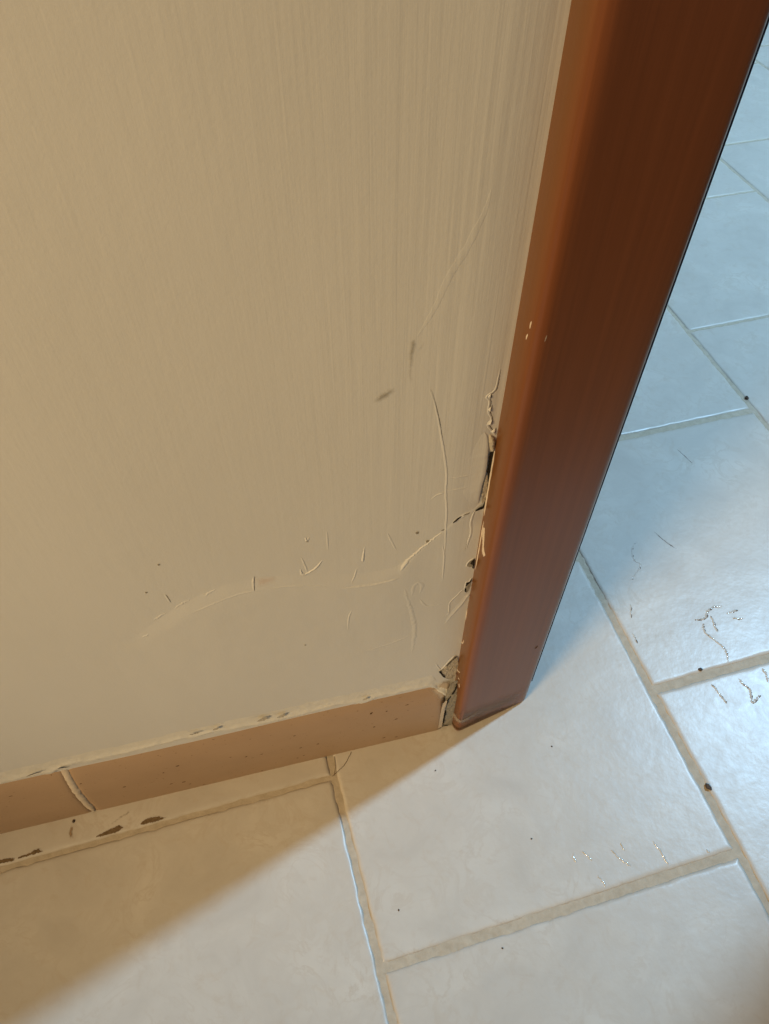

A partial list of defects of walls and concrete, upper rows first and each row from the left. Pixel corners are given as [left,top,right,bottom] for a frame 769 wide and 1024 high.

crack [400,390,475,571]
spalling [444,528,485,625]
peeling [0,656,460,784]